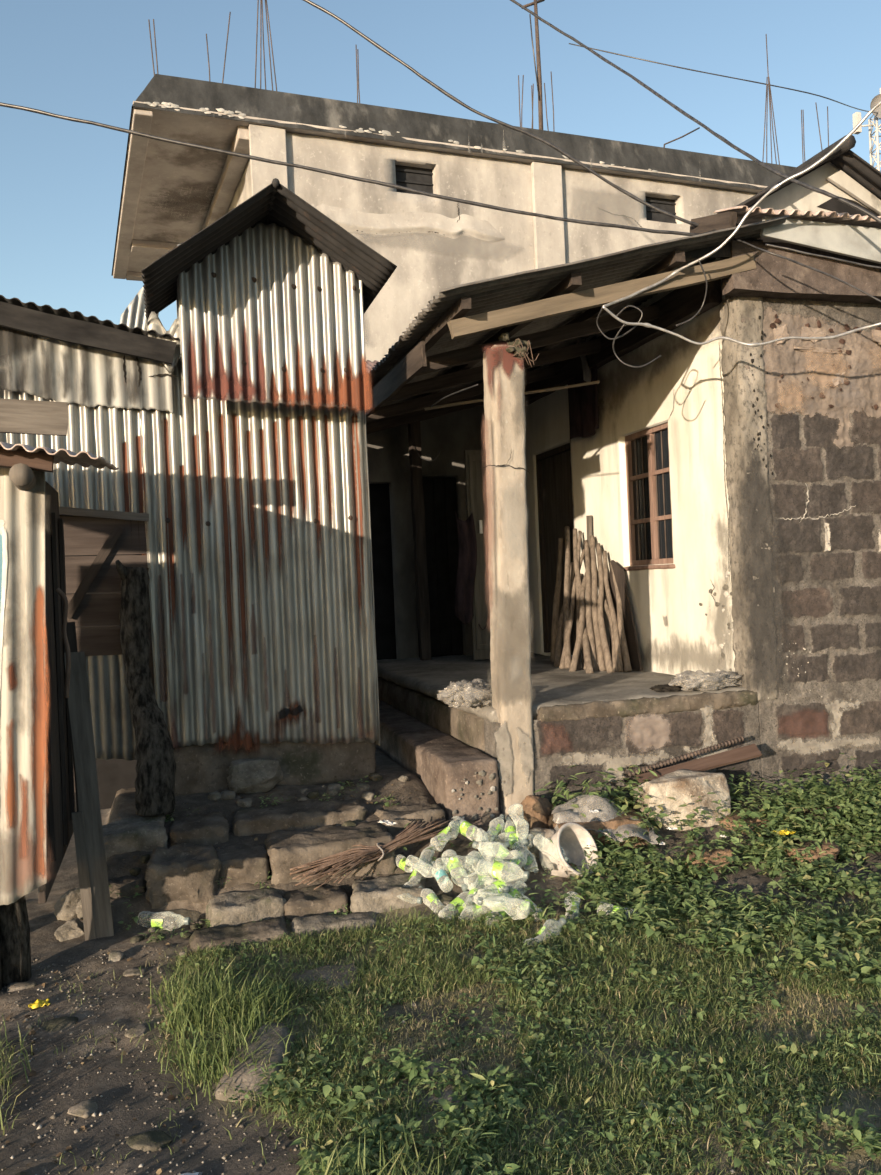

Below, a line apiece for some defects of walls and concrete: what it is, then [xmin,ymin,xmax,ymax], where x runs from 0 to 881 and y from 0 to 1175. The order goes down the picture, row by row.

rust [122,436,147,536]
rust [158,326,374,754]
crack [775,483,855,522]
rust [6,587,49,884]